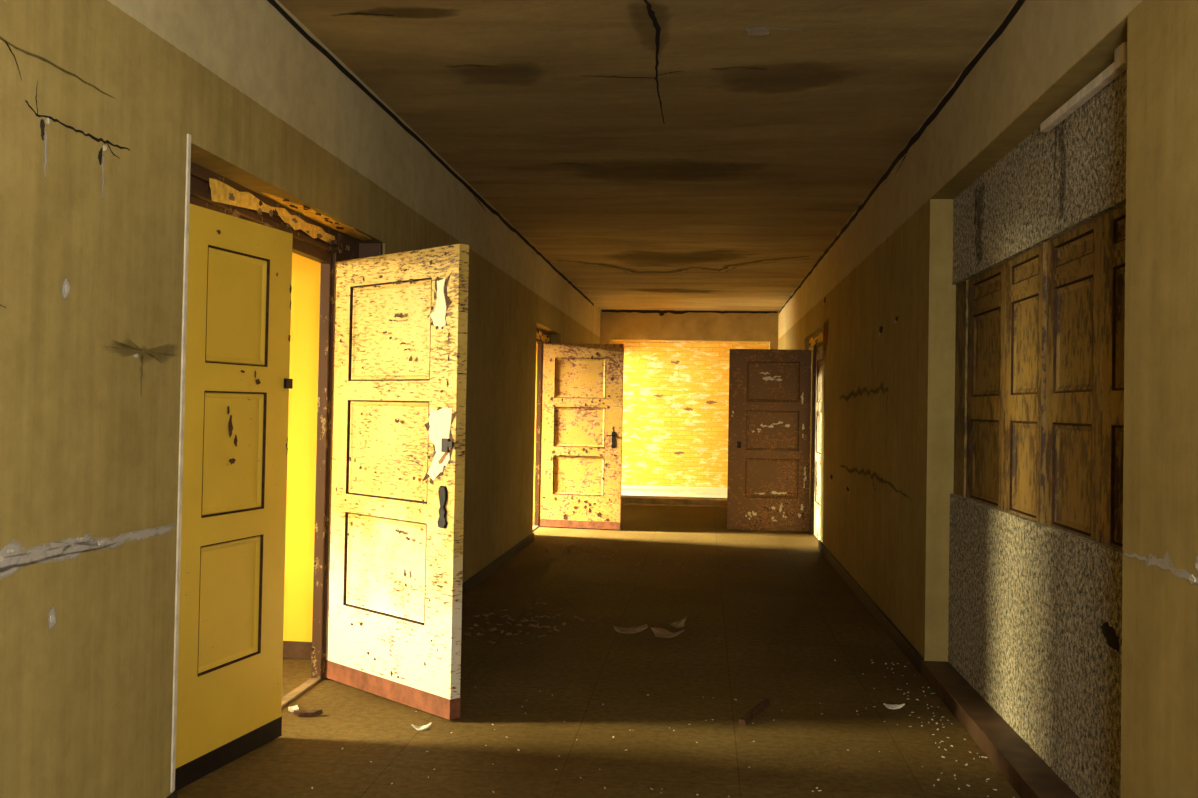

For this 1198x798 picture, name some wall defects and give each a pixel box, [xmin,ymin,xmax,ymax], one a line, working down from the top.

crack [1,38,130,159]
crack [267,0,1025,316]
peeling [209,178,371,253]
peeling [427,252,452,361]
spalling [227,406,238,465]
peeling [399,380,459,485]